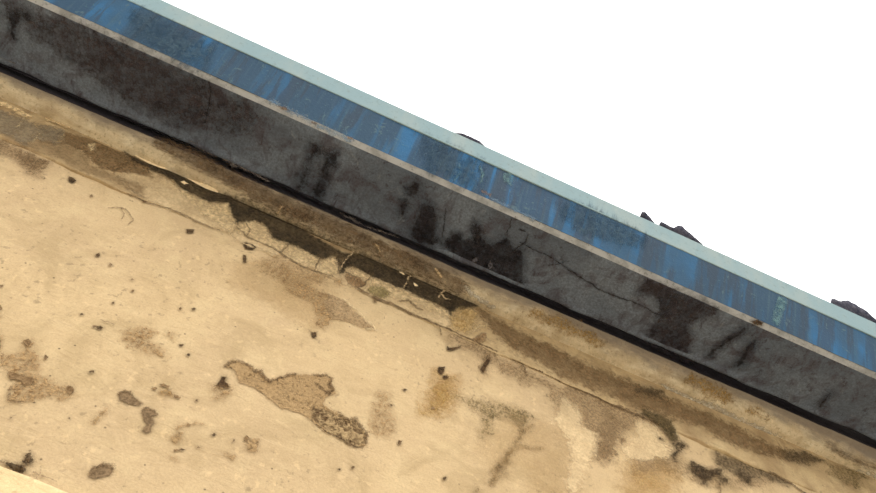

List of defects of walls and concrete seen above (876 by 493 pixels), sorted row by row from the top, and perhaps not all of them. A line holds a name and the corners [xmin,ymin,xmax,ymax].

water stain [6,3,254,133]
crack [109,194,663,422]
water stain [61,130,876,492]
peeling [89,463,113,479]
peeling [118,391,158,433]
flaking render [214,360,393,447]
crack [477,417,541,489]